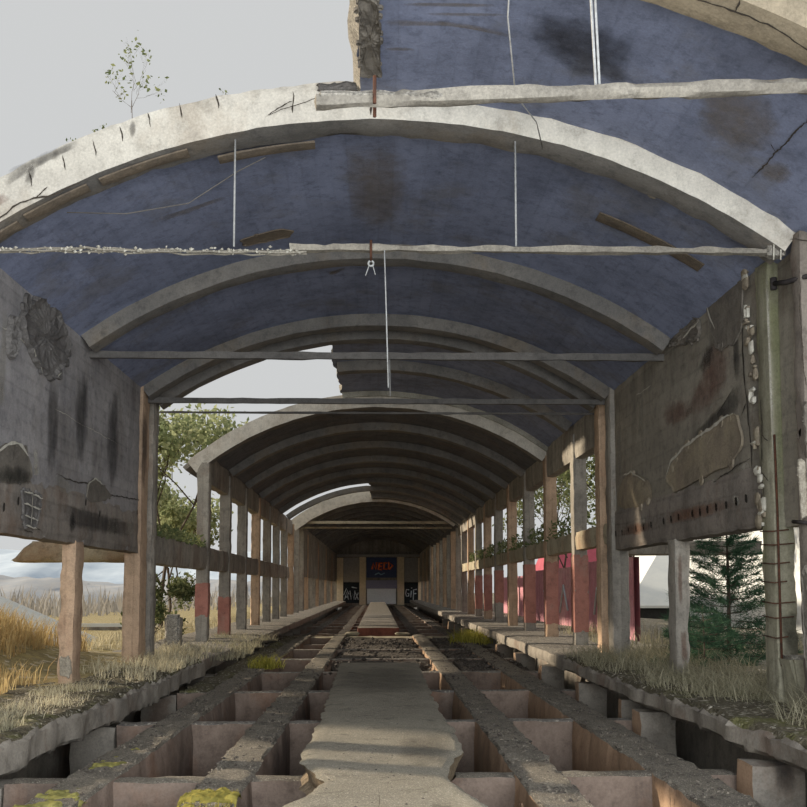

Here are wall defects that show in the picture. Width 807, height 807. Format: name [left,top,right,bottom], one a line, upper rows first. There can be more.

spalling [316,0,384,92]
crack [698,0,807,50]
crack [752,121,807,178]
crack [0,155,81,218]